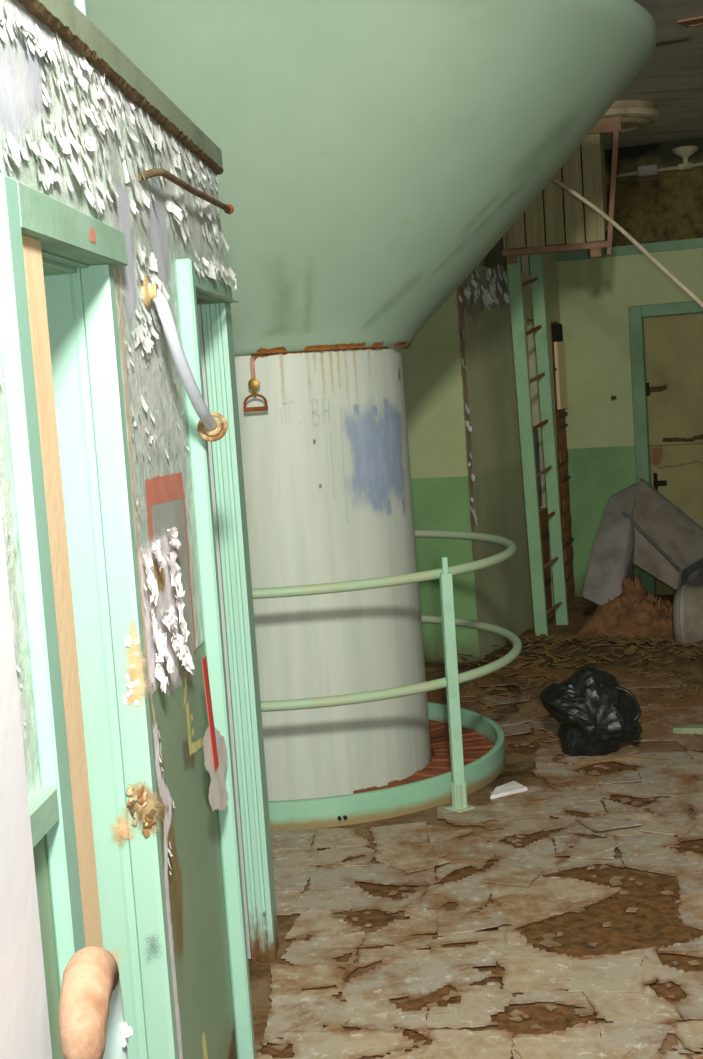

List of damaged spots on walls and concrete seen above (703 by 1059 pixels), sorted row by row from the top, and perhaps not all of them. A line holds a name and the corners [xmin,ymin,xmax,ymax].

flaking render [0,0,239,358]
corrosion [251,341,410,419]
peeling [456,263,510,561]
crack [659,434,703,469]
spalling [108,779,168,851]
peeling [499,828,567,848]
peeling [334,859,498,929]
peeling [515,864,703,972]
peeling [395,1028,432,1052]
peeling [394,966,505,1012]
peeling [491,1004,597,1038]
peeling [652,983,687,1002]